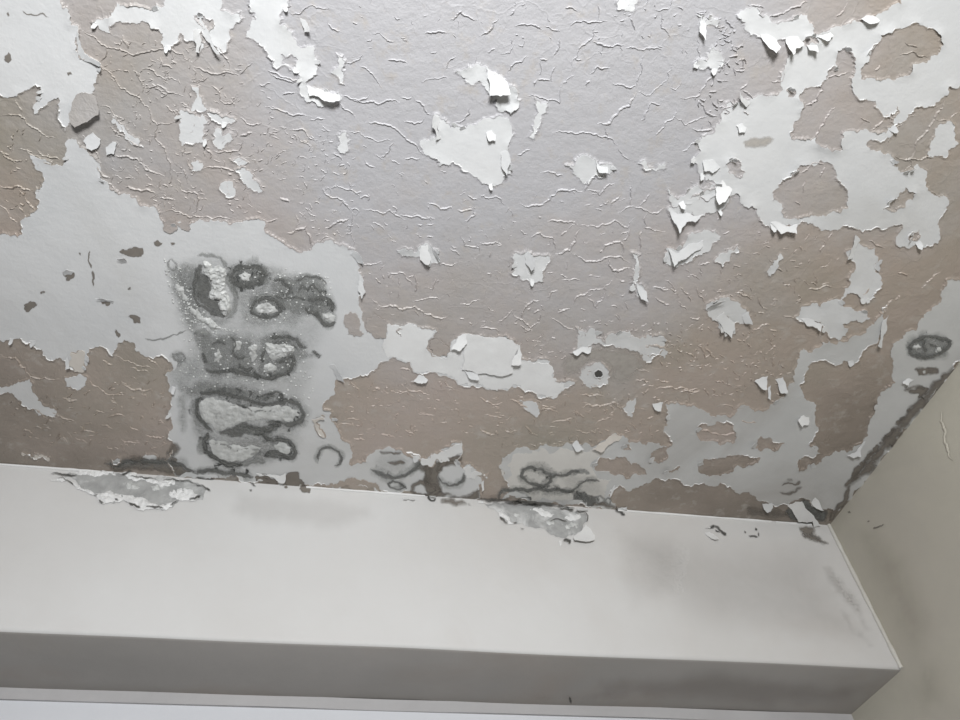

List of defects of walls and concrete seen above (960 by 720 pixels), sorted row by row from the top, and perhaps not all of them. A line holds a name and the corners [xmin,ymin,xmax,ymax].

leakage [108,253,336,493]
leakage [373,452,479,505]
crack [82,0,839,449]
peeling [0,0,960,546]
leakage [498,465,616,508]
leakage [749,335,954,544]
crack [863,272,940,310]